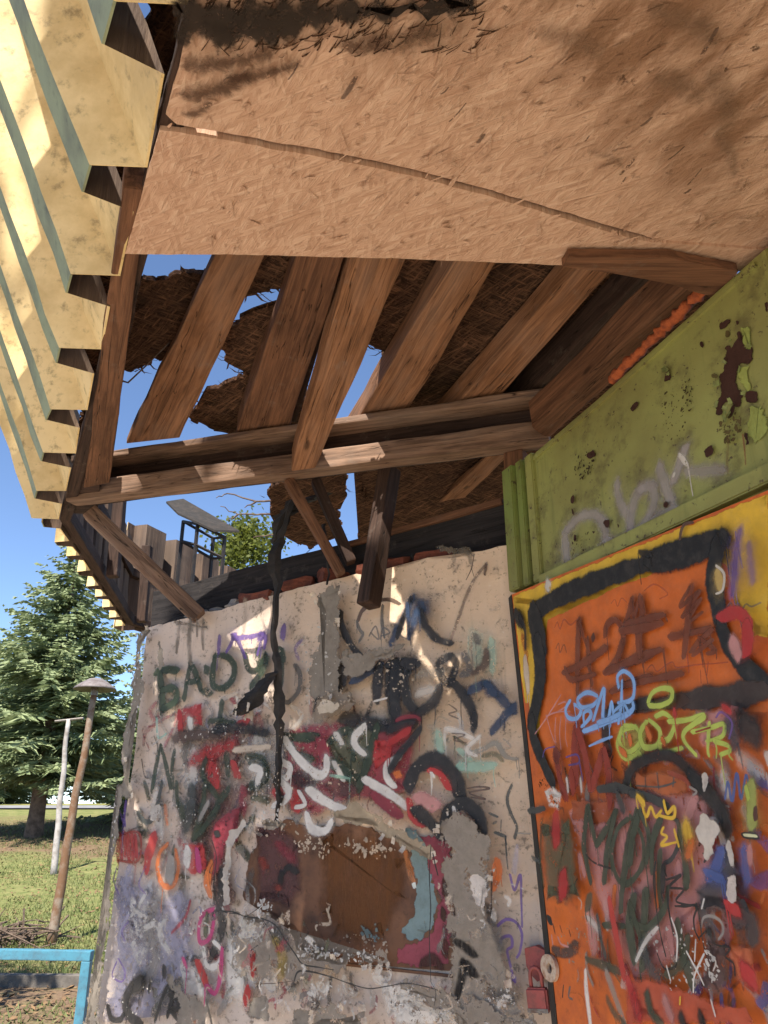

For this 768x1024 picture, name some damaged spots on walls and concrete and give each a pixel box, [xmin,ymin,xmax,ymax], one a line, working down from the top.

peeling [704,319,768,458]
peeling [174,696,254,786]
peeling [221,564,537,1024]